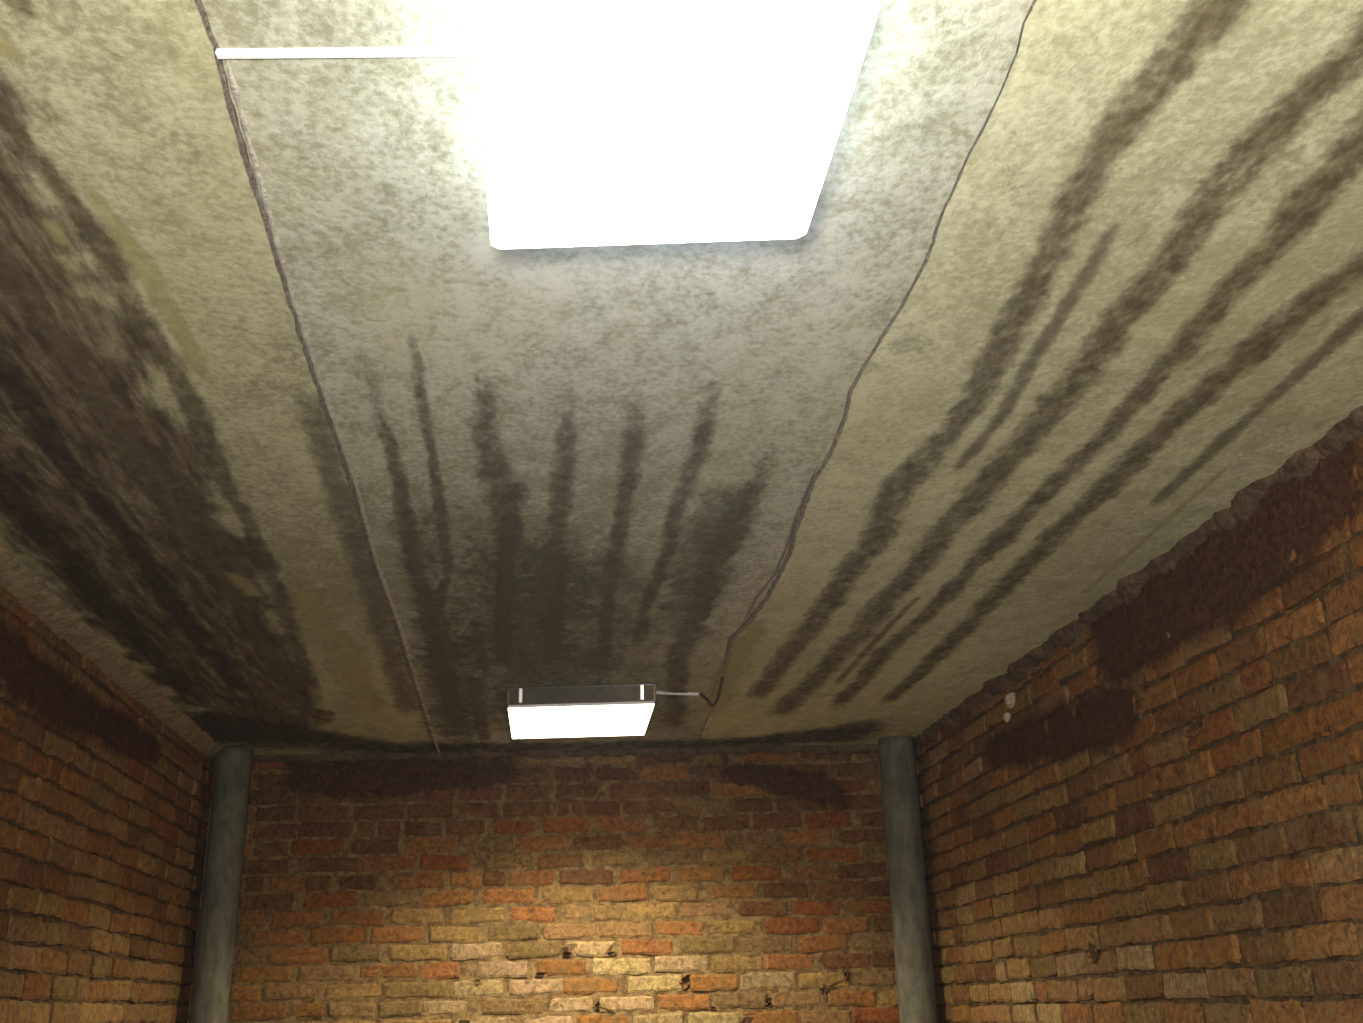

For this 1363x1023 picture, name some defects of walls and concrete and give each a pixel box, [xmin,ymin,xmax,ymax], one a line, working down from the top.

crack [194,0,440,752]
damp [0,81,881,753]
crack [721,0,1037,674]
damp [750,0,1363,714]